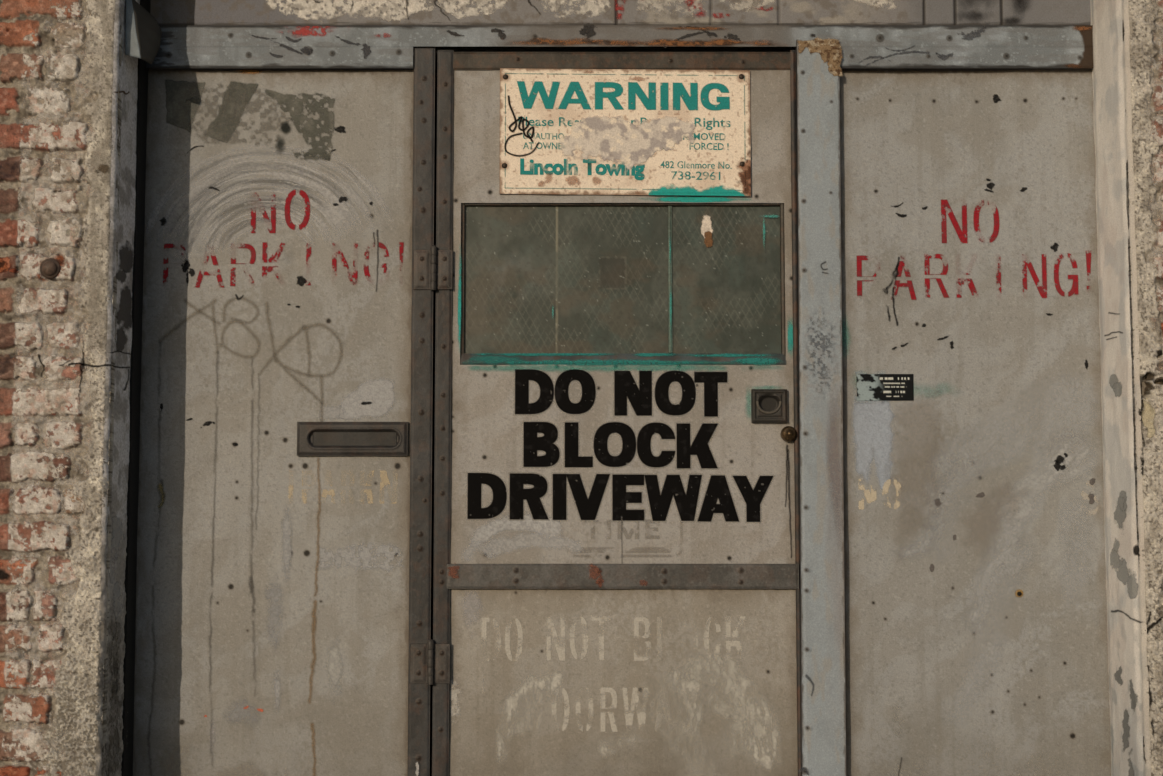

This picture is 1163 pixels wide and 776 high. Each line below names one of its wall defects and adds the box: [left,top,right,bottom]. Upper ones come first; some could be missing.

peeling [267,0,506,36]
peeling [545,0,610,39]
peeling [638,0,741,48]
peeling [720,0,774,10]
peeling [855,0,896,9]
corrosion [797,37,843,76]
peeling [1151,62,1163,200]
peeling [1153,220,1163,330]
peeling [1109,374,1122,396]
spalling [1140,373,1163,410]
peeling [1110,491,1139,599]